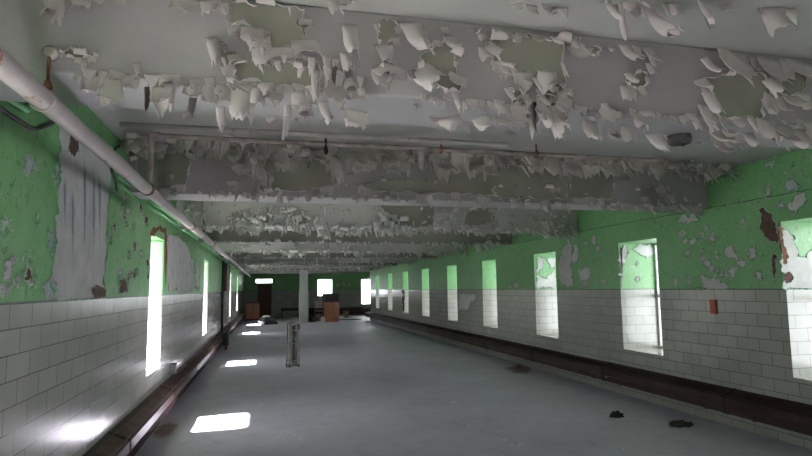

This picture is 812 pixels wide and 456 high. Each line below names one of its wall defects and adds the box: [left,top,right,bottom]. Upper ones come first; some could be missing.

peeling [38,0,104,27]
peeling [0,126,149,301]
corrosion [150,225,168,285]
peeling [59,0,812,365]